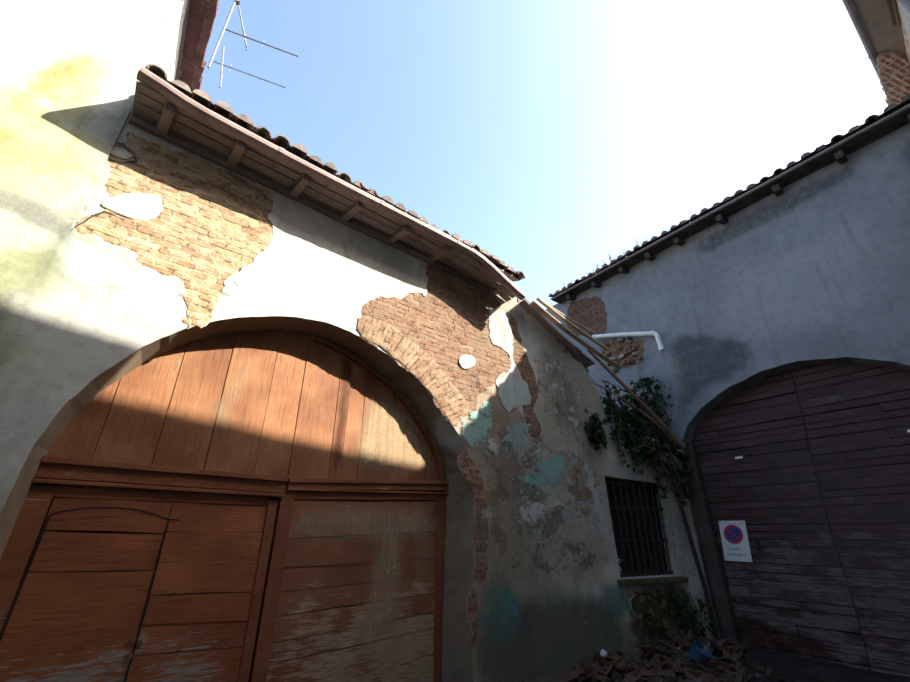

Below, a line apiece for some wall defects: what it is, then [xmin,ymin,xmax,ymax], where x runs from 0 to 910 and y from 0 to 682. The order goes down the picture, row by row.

spalling [57,125,285,329]
spalling [353,259,622,574]
spalling [563,292,651,373]
leakage [674,336,746,403]